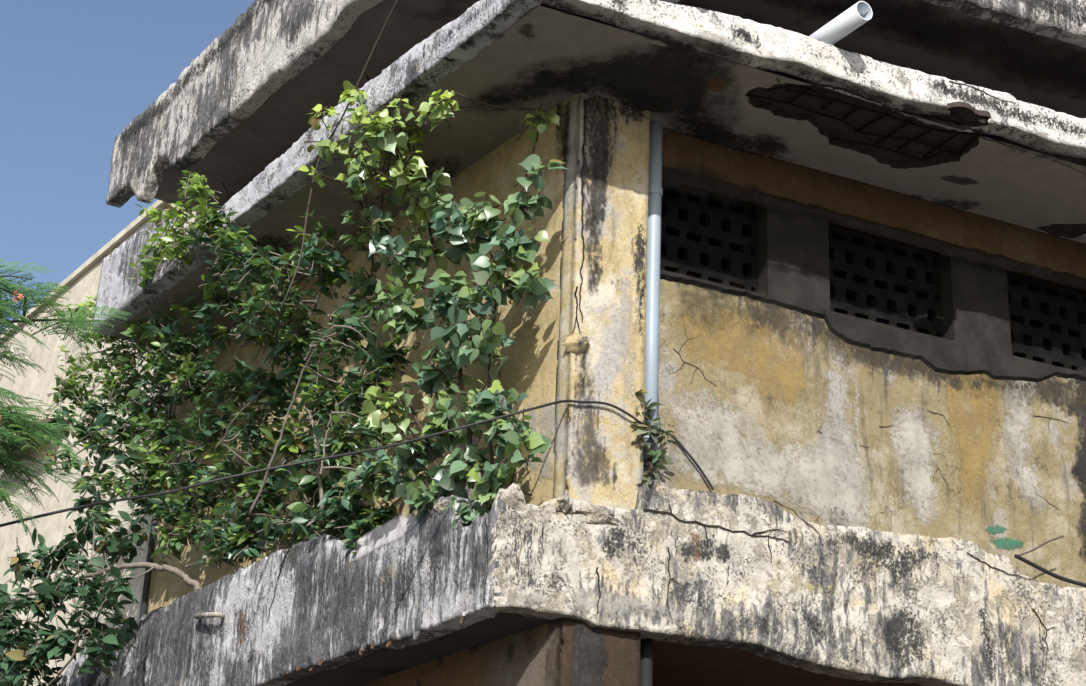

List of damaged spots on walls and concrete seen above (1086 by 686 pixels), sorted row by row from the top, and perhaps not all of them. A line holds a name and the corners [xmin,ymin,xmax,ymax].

leakage [120,0,275,150]
spalling [745,78,991,185]
crack [572,99,586,334]
leakage [479,0,788,401]
spalling [1036,223,1086,238]
crack [673,317,716,386]
leakage [681,293,1086,559]
crack [666,547,687,625]
leakage [674,534,735,585]
crack [643,500,824,562]
leakage [829,507,938,590]
leakage [878,607,928,674]